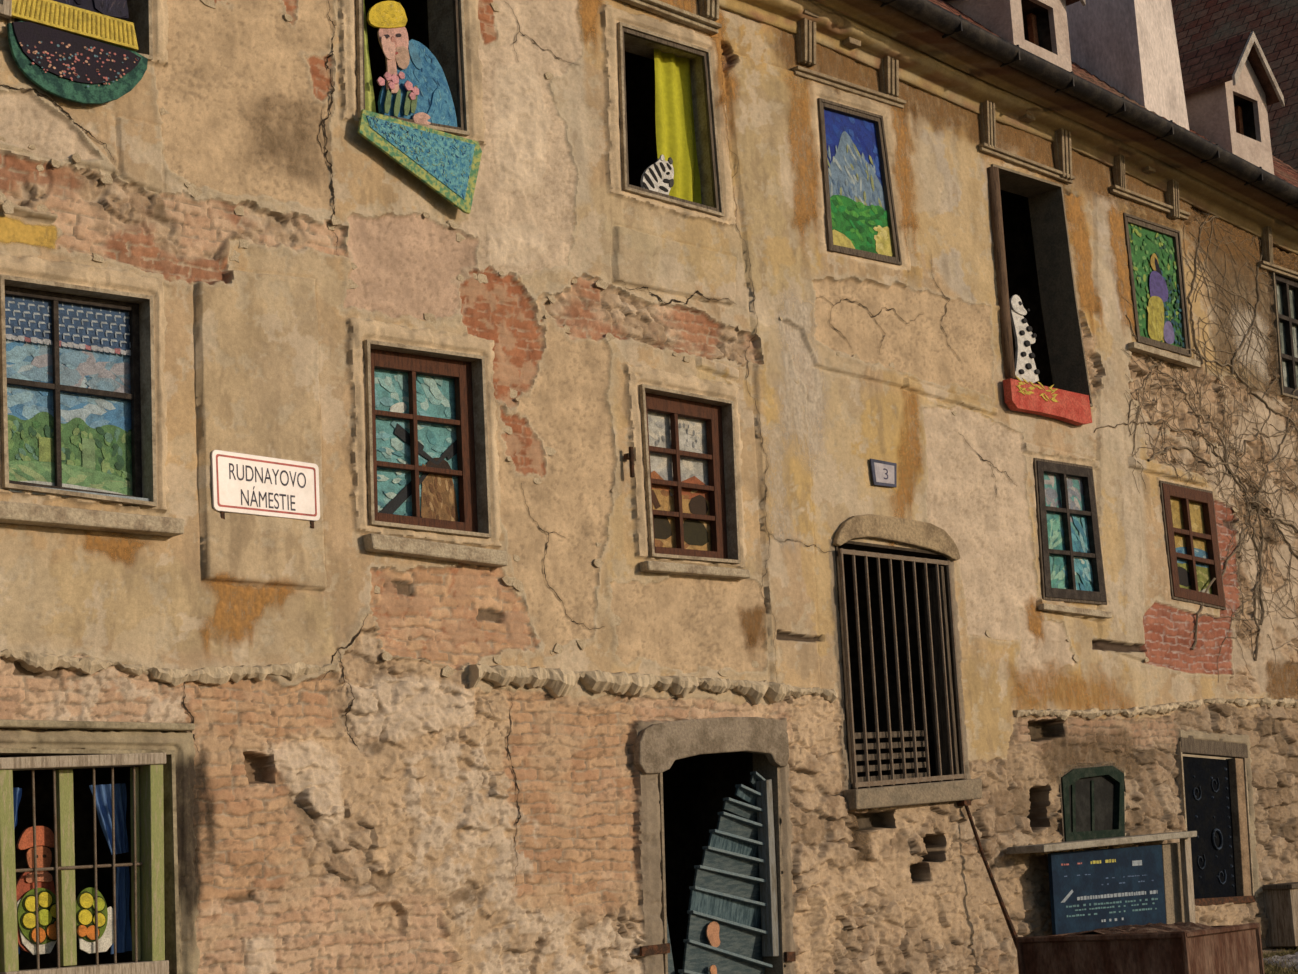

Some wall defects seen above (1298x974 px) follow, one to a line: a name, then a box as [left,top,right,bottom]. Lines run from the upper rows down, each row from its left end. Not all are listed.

crack [317,1,339,256]
water stain [780,30,880,92]
flaking render [0,0,826,677]
crack [820,260,959,358]
water stain [897,80,1298,394]
flaking render [779,233,1298,701]
crack [521,483,604,630]
spalling [243,750,277,784]
crack [507,693,521,886]
spalling [854,809,897,832]
spalling [910,833,947,883]
spalling [1028,718,1067,742]